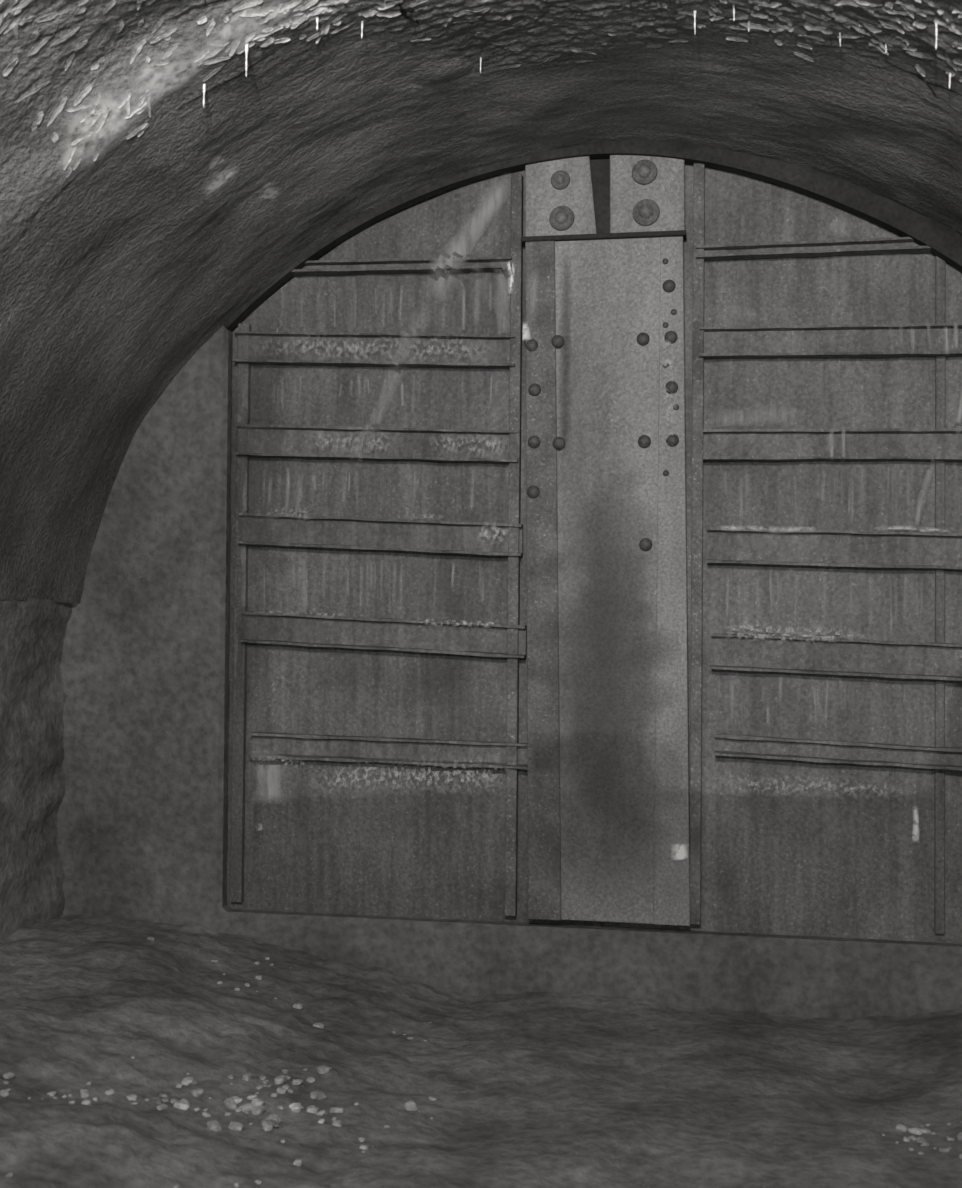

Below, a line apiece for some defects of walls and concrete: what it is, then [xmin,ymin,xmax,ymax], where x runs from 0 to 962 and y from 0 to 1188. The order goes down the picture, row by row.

flaking render [0,0,88,76]
flaking render [130,0,179,67]
flaking render [193,0,428,82]
flaking render [441,0,581,70]
flaking render [537,0,962,82]
flaking render [15,81,51,103]
flaking render [31,84,155,178]